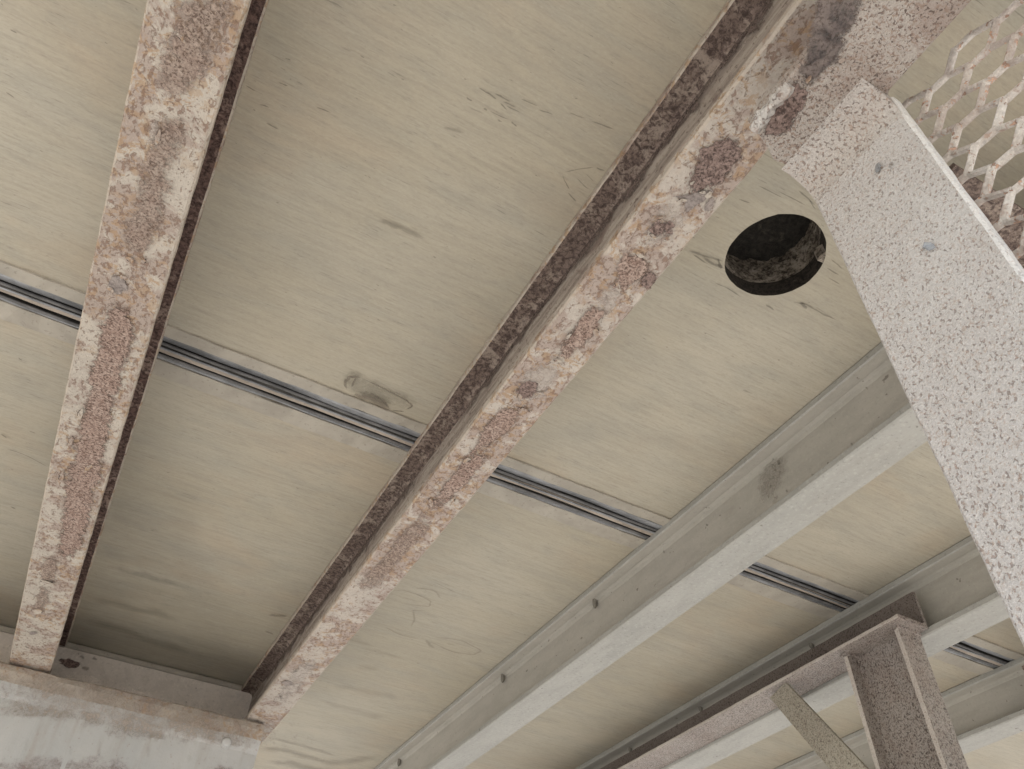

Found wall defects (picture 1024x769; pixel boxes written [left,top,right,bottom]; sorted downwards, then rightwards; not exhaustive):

corrosion [155,0,233,95]
corrosion [765,0,863,136]
corrosion [124,117,183,264]
corrosion [471,0,773,405]
corrosion [59,659,80,668]
corrosion [32,304,136,614]
corrosion [267,484,411,679]
corrosion [359,381,539,589]